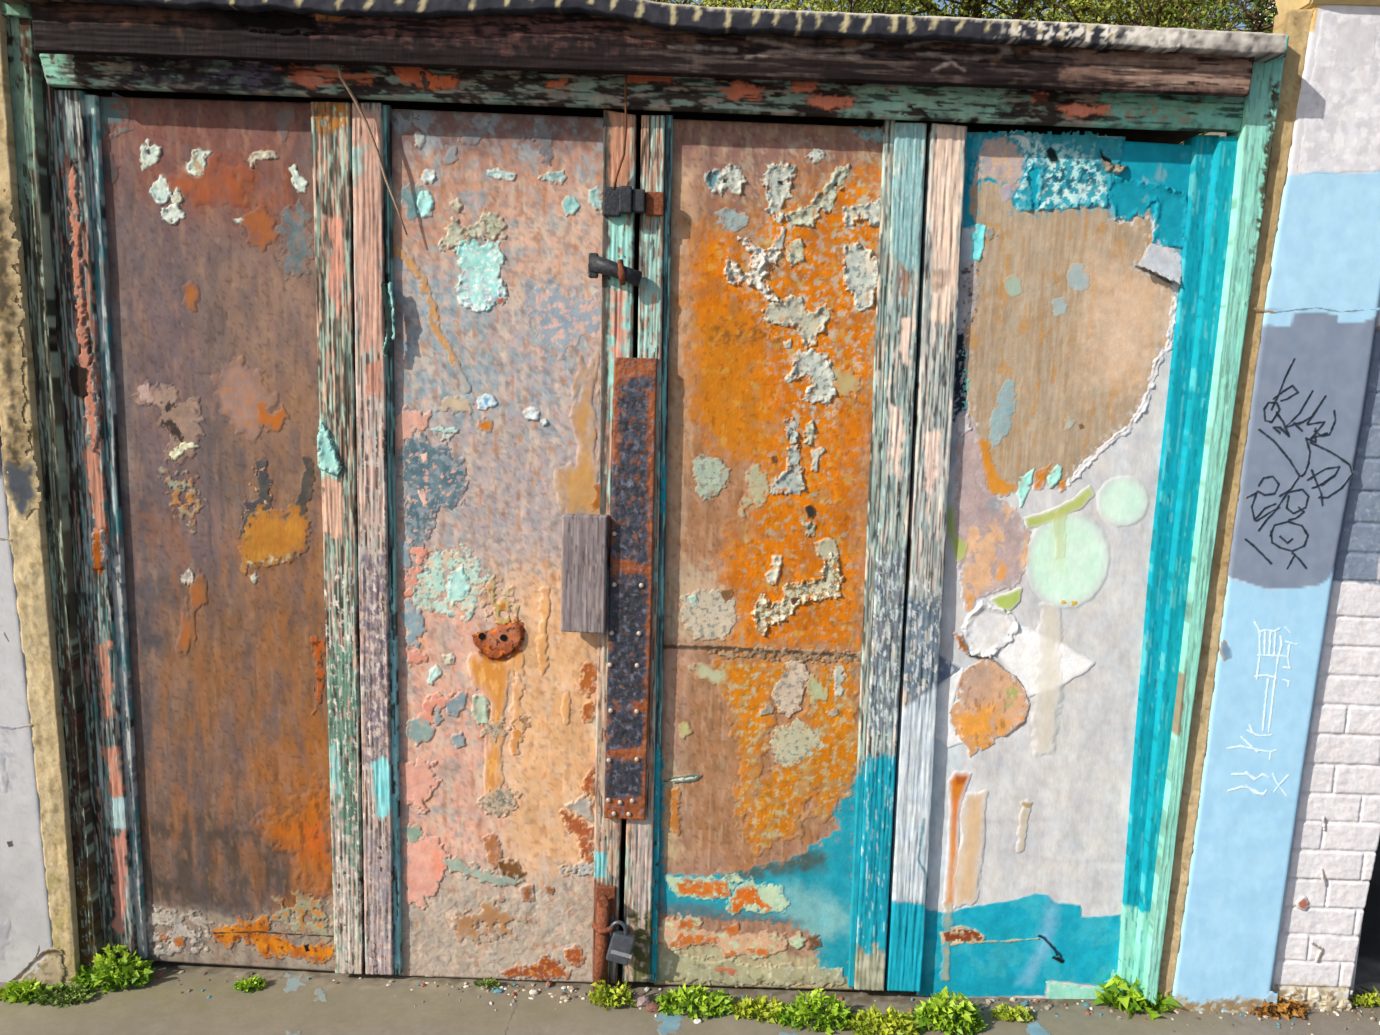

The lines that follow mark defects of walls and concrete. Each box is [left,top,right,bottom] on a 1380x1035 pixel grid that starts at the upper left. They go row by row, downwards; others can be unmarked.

peeling [139,138,213,226]
peeling [396,168,508,314]
crack [1252,306,1380,314]
peeling [678,147,881,642]
peeling [949,102,1188,758]
peeling [398,541,492,626]
corrosion [466,573,552,796]
corrosion [561,689,572,726]
corrosion [249,771,333,900]
peeling [401,765,595,981]
peeling [650,872,848,989]
corrosion [939,770,990,982]